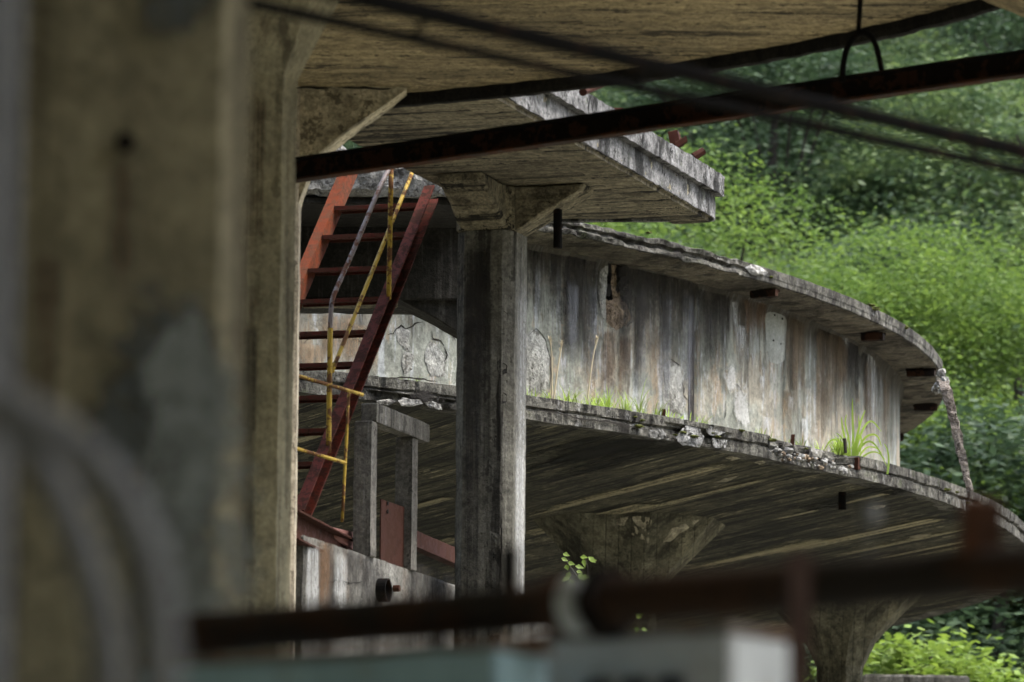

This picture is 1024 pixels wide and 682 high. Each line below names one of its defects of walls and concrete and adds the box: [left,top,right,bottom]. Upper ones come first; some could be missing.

crack [388,322,456,383]
leakage [520,251,598,373]
crack [528,328,649,430]
leakage [620,264,743,372]
leakage [726,367,749,426]
spalling [754,445,861,476]